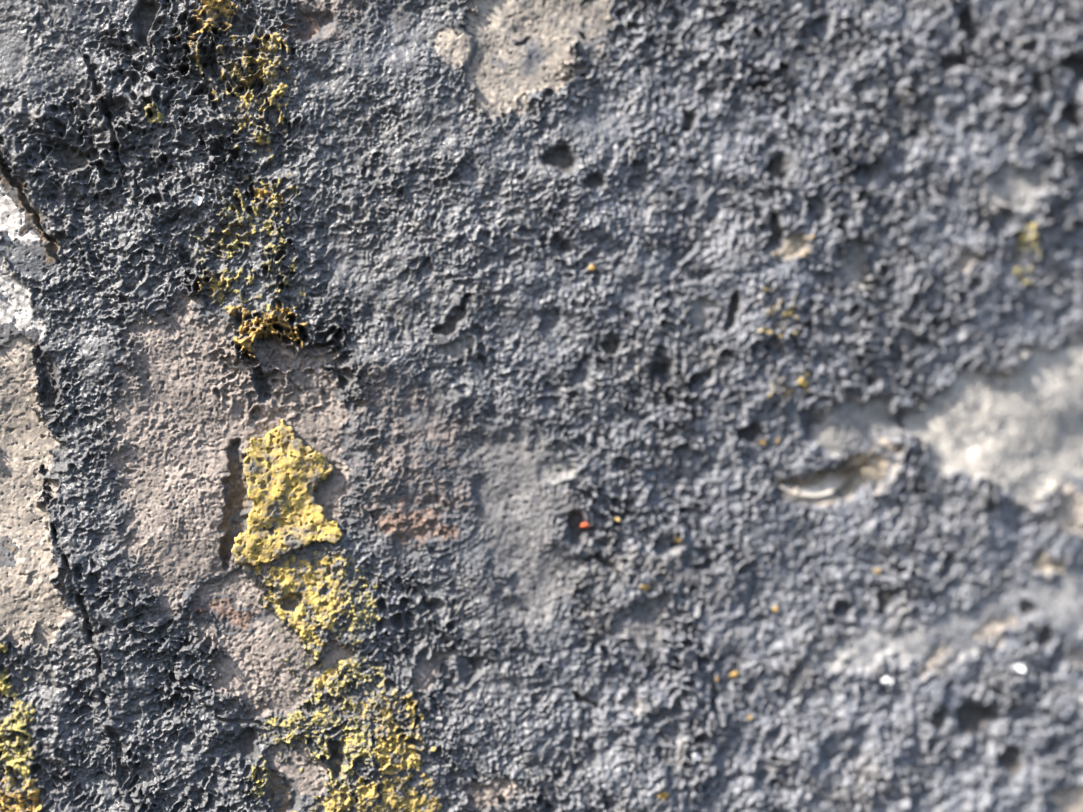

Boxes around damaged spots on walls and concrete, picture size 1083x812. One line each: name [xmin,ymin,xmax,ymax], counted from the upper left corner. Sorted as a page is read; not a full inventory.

spalling [429,0,624,131]
spalling [0,175,80,672]
crack [39,464,143,797]
spalling [96,284,366,812]
spalling [770,322,1083,690]